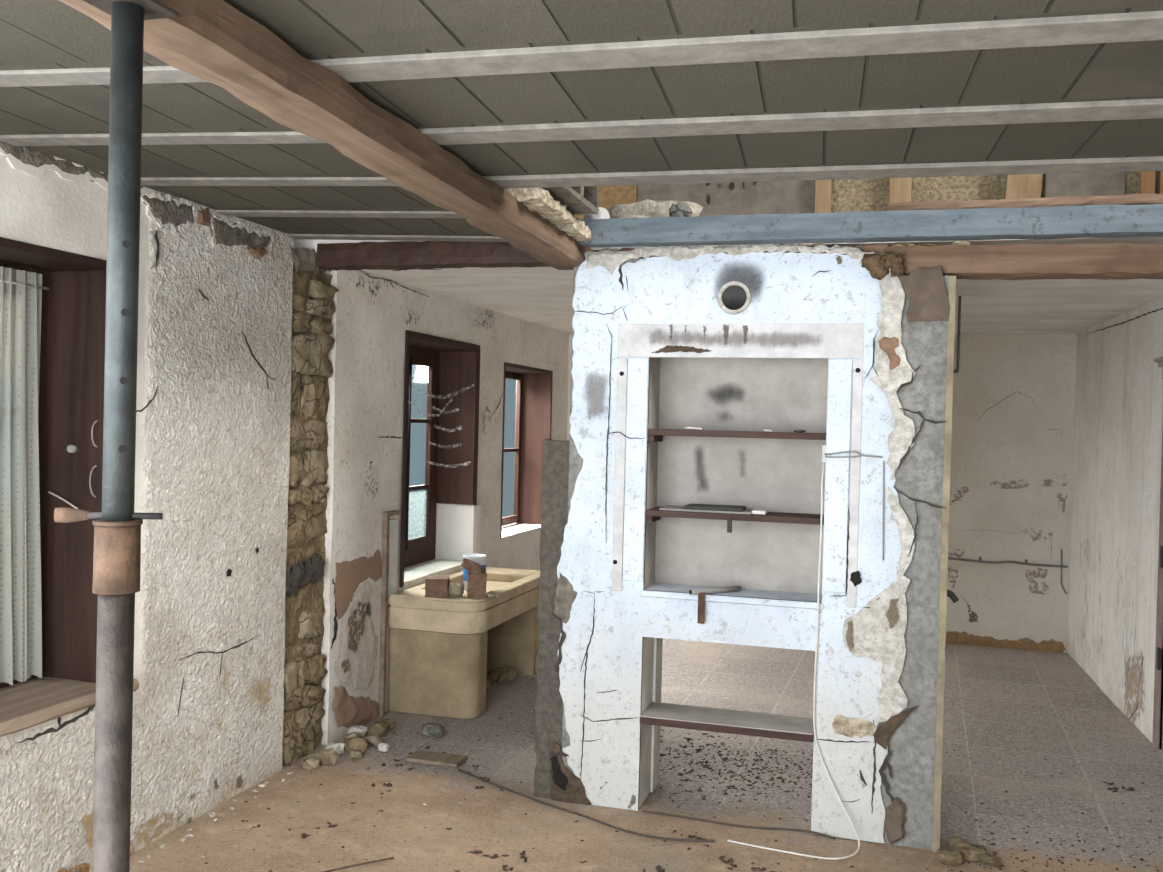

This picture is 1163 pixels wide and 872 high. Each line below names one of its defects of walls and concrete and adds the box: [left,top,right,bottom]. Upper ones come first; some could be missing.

flaking render [0,141,108,190]
flaking render [140,186,275,259]
crack [241,331,276,390]
crack [136,386,158,412]
crack [864,329,947,556]
flaking render [282,245,382,766]
flaking render [832,268,919,750]
flaking render [1044,476,1067,512]
flaking render [1025,568,1049,594]
crack [177,634,260,717]
crack [17,705,95,743]
flaking render [883,797,906,844]